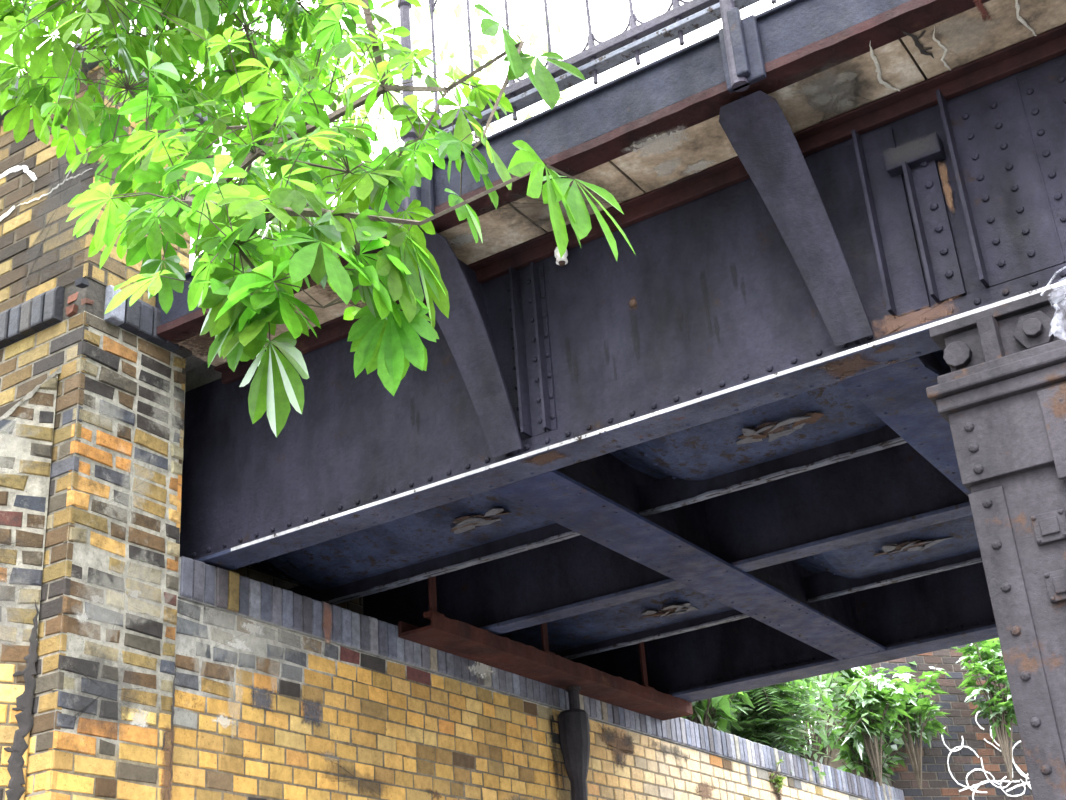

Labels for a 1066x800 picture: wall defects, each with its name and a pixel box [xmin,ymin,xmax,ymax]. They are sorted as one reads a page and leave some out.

crack [1015,0,1037,36]
crack [869,41,900,91]
crack [903,27,951,71]